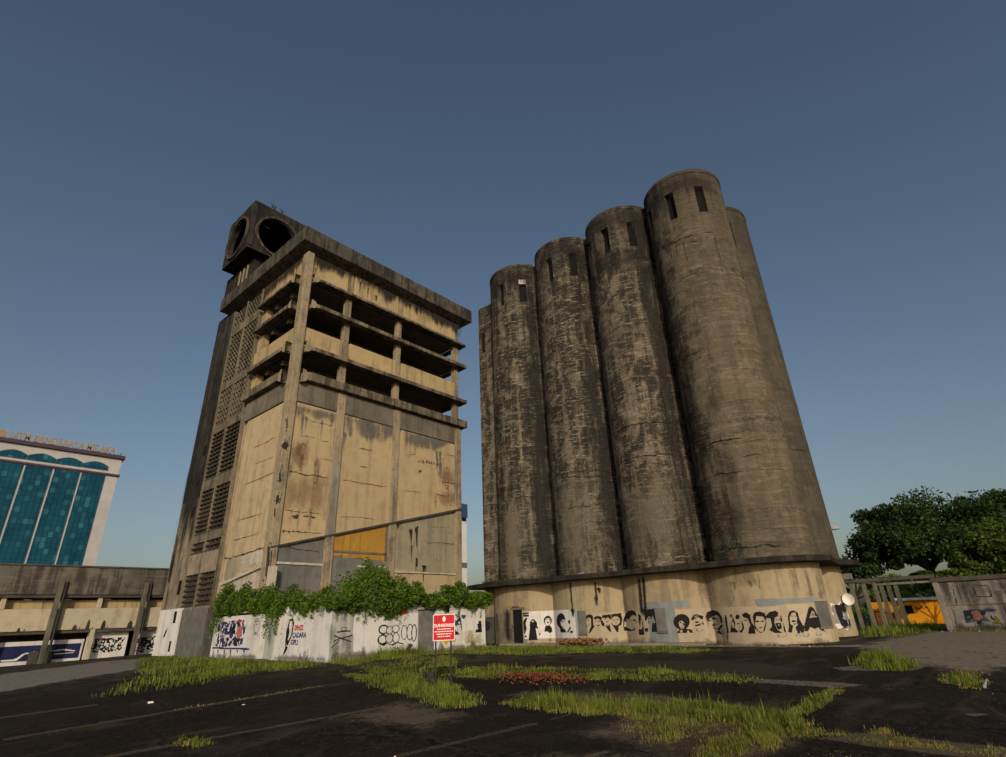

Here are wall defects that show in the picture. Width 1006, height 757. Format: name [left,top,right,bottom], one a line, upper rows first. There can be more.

damp [241,256,461,334]
damp [502,217,707,578]
damp [343,417,393,442]
damp [405,431,446,469]
damp [637,577,647,616]